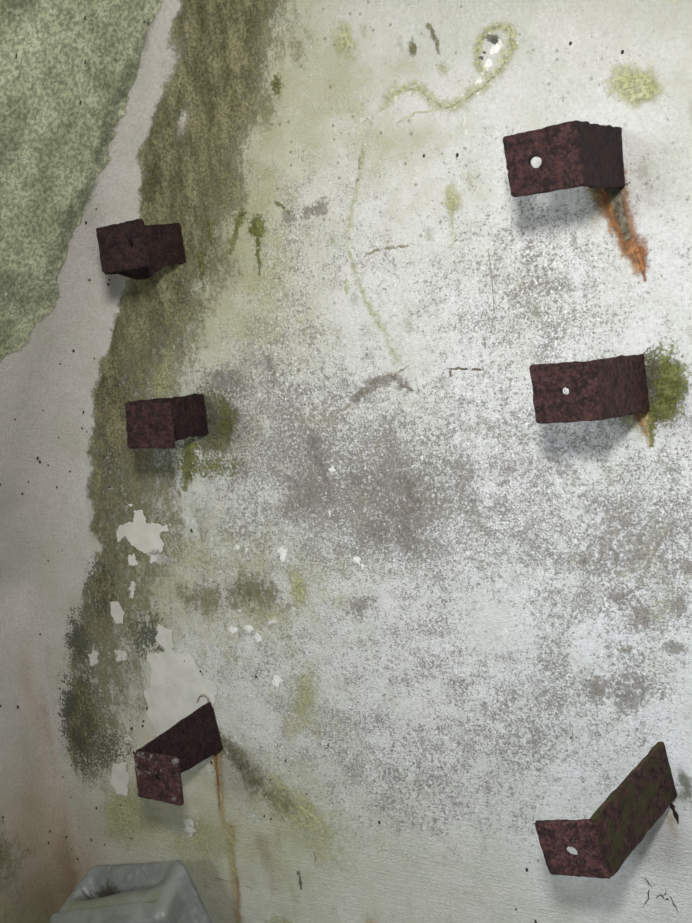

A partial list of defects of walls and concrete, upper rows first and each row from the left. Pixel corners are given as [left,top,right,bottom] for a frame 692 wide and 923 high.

leakage [136,0,201,215]
leakage [230,208,245,254]
leakage [275,196,329,226]
corrosion [589,171,647,281]
peeling [116,504,177,566]
peeling [88,644,99,667]
leakage [57,607,132,778]
peeling [110,601,125,624]
peeling [114,650,128,662]
leakage [128,612,164,663]
peeling [144,624,217,737]
corrosion [214,752,239,919]